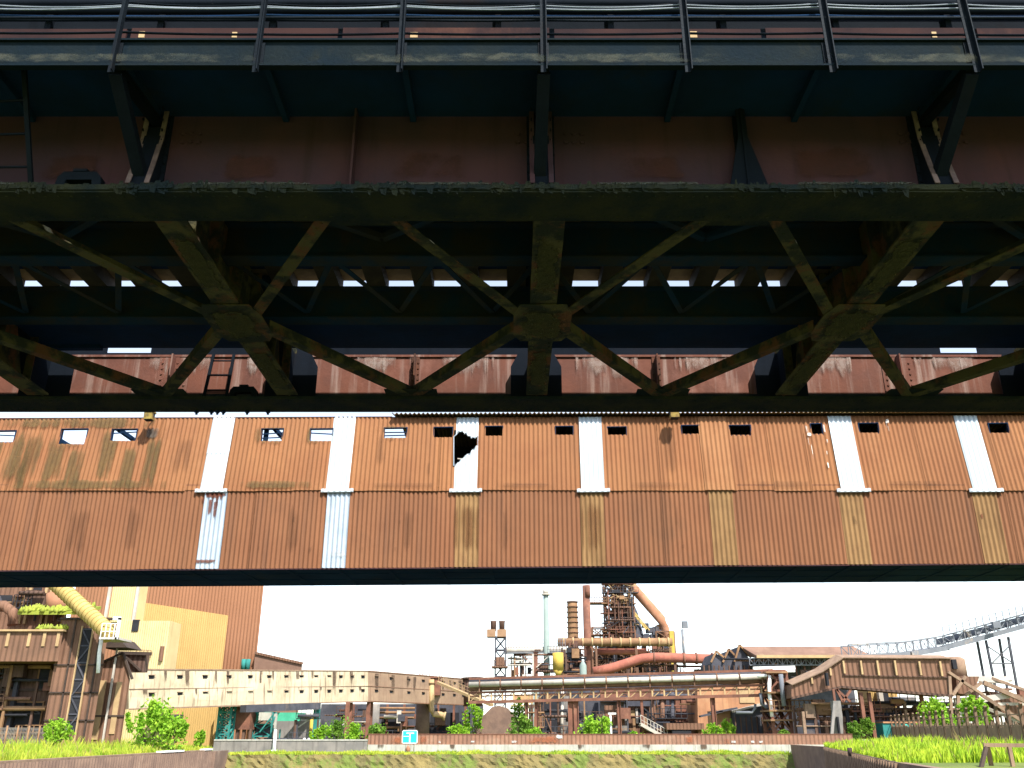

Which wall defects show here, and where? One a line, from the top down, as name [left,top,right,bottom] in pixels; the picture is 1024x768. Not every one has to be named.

leakage [0,418,161,489]